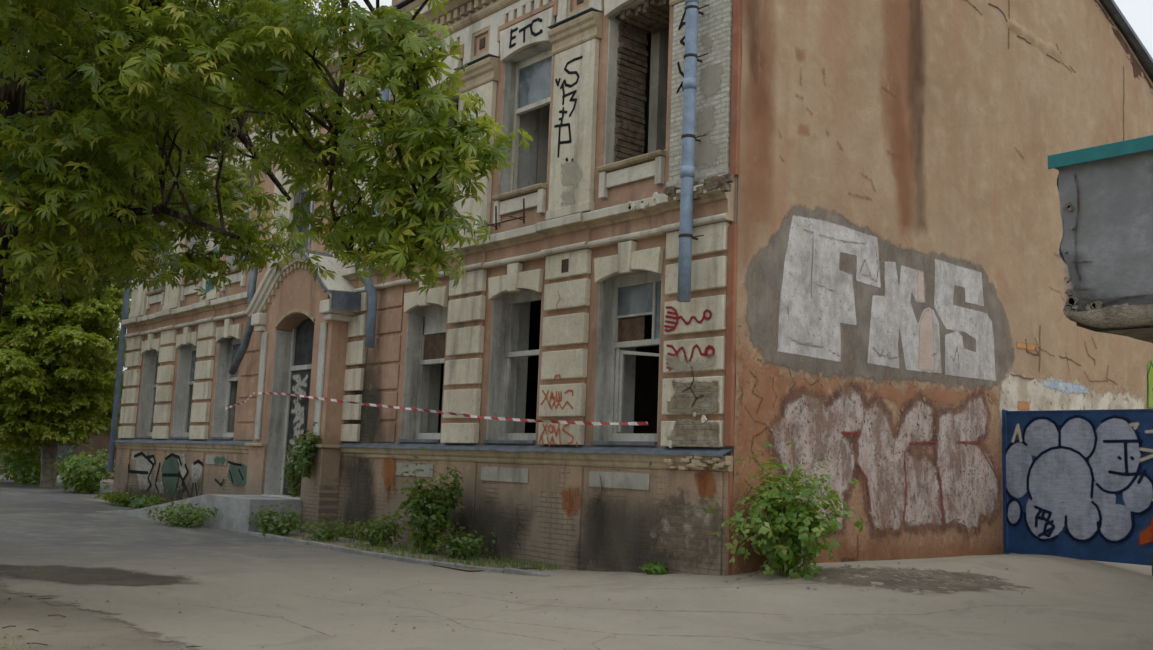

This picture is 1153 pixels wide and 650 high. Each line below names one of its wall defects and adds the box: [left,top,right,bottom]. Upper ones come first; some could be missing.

crack [967,0,1076,73]
peeling [628,65,734,211]
damp [887,1,913,221]
spalling [1063,250,1153,315]
damp [348,363,380,443]
crack [682,366,704,406]
spalling [663,355,731,470]
peeling [999,371,1144,428]
corrosion [695,471,715,497]
damp [452,505,521,558]
damp [578,495,668,570]